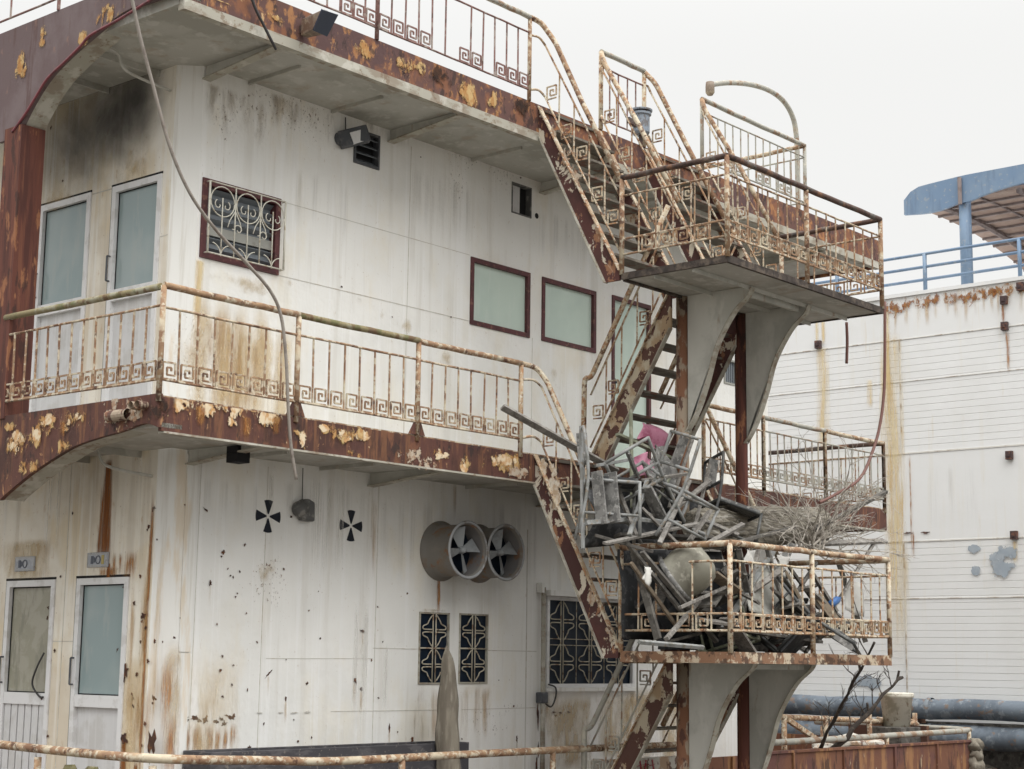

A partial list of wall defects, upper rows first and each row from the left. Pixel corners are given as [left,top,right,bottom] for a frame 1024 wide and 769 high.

peeling [96,3,118,23]
peeling [15,53,27,78]
peeling [396,57,497,113]
peeling [513,98,530,116]
corrosion [886,283,1024,320]
peeling [104,398,280,433]
peeling [4,411,84,475]
peeling [319,424,370,458]
corrosion [98,462,134,578]
peeling [968,545,1017,578]
corrosion [120,512,153,769]
corrosion [161,656,179,755]